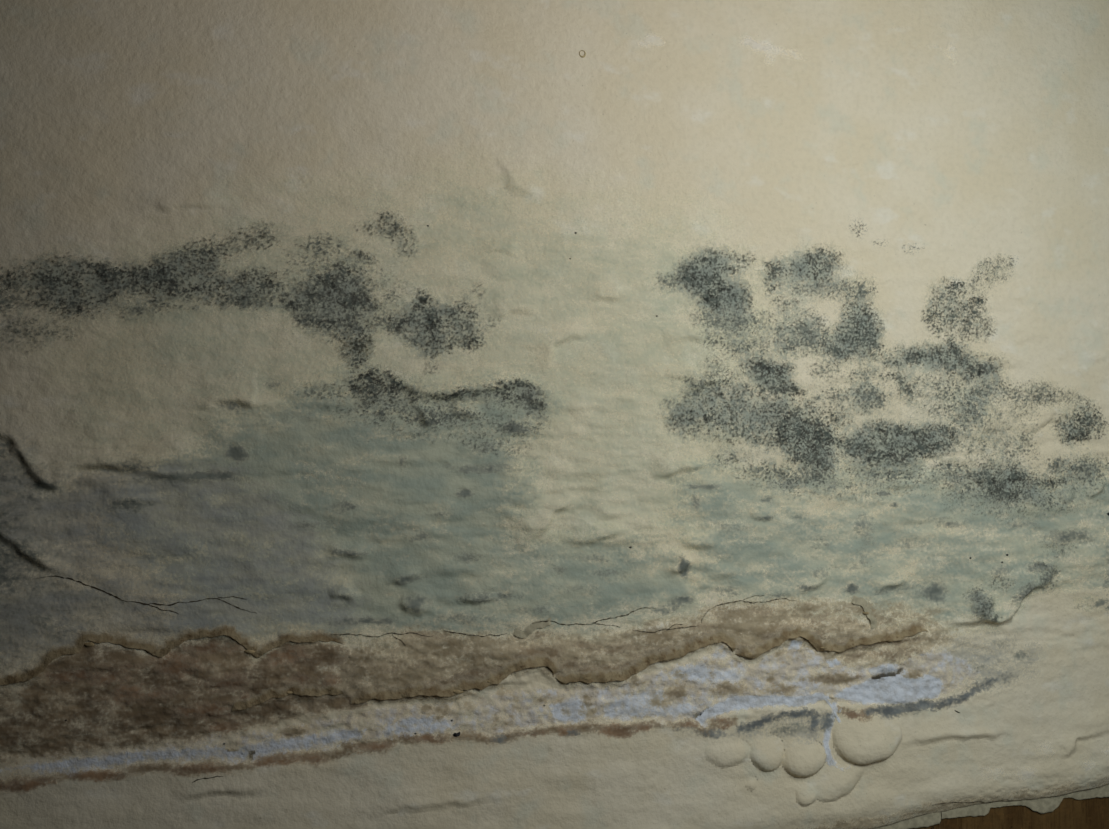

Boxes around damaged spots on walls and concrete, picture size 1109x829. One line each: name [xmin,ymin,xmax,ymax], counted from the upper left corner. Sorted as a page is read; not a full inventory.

leakage [0,204,1109,771]
crack [37,576,256,613]
spalling [0,596,980,780]